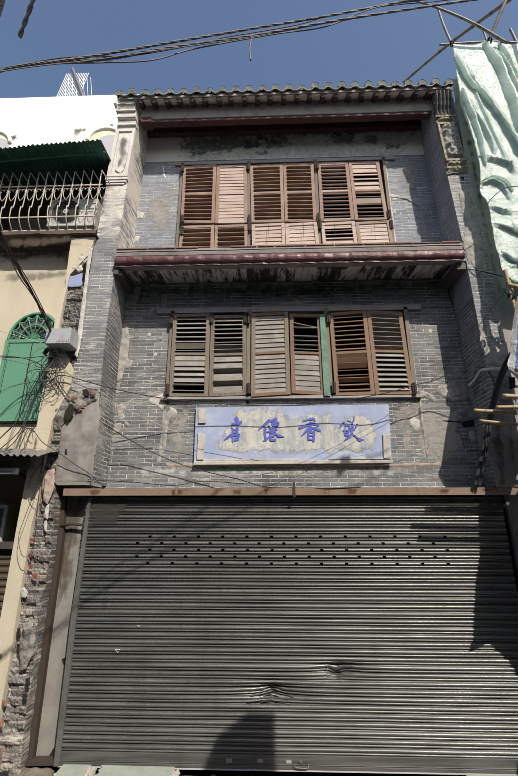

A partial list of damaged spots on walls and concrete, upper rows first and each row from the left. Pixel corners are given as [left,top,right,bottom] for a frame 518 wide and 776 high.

flaking render [54,387,99,425]
peeling [149,393,177,456]
spalling [443,420,476,442]